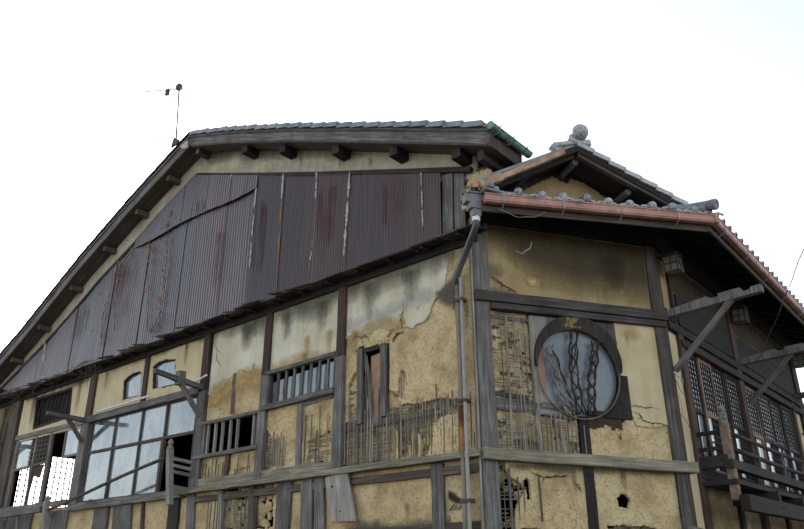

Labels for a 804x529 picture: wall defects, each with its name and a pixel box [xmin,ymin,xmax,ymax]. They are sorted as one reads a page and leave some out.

leakage [348,250,454,298]
leakage [280,291,337,327]
leakage [348,276,455,341]
peeling [206,369,262,421]
peeling [344,330,376,424]
peeling [387,247,477,460]
crack [628,391,684,432]